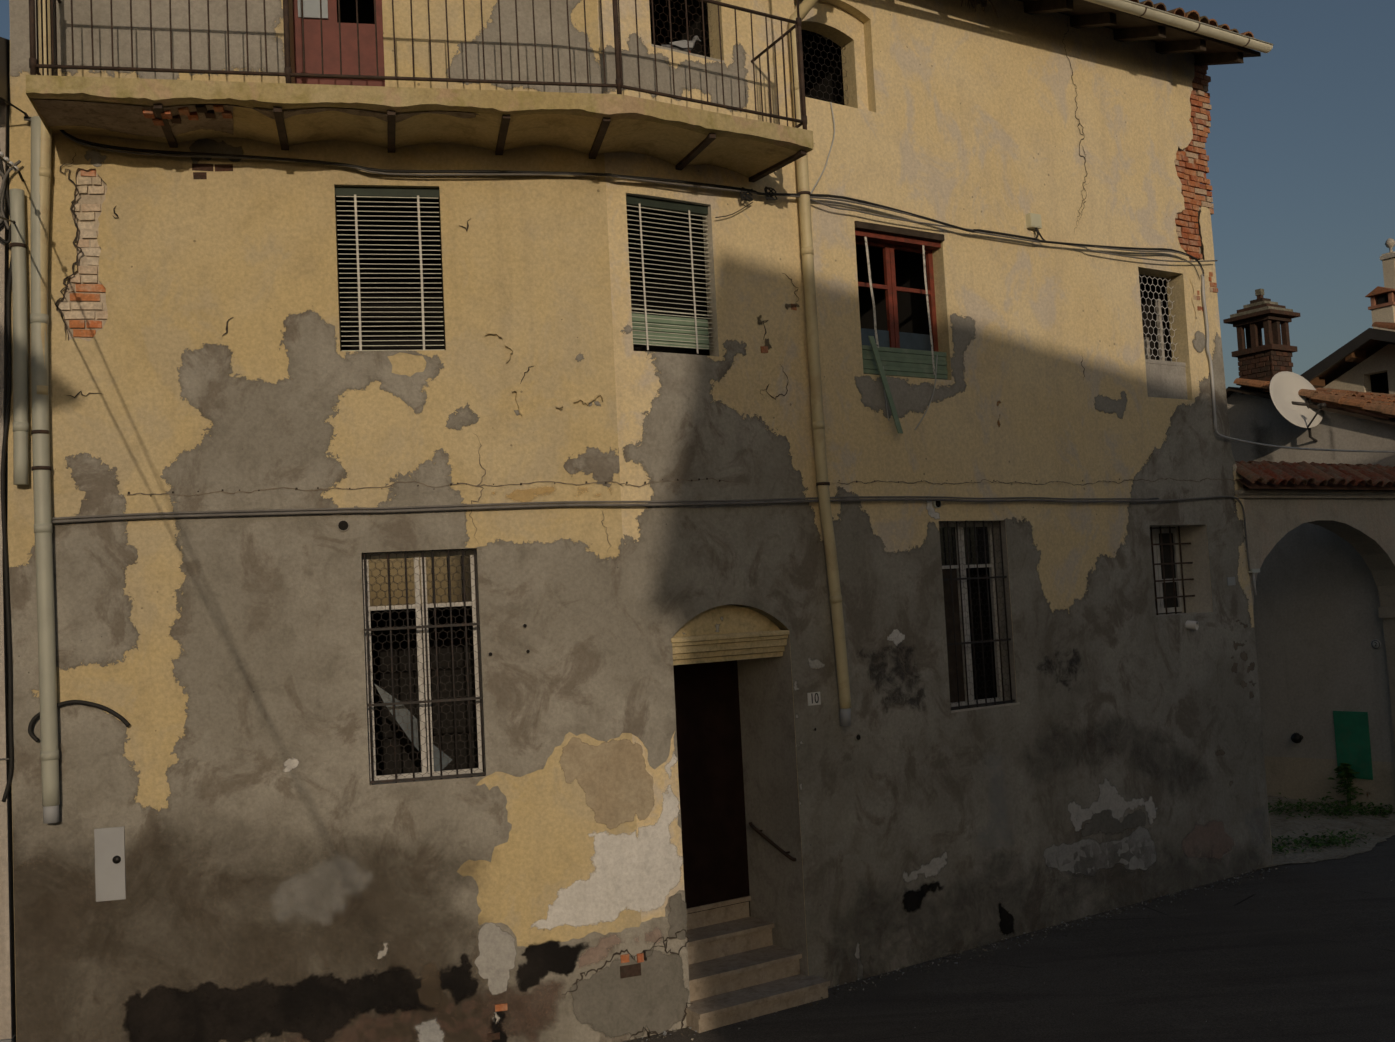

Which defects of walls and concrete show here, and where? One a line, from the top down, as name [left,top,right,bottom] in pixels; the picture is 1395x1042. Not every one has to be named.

peeling [10,0,37,77]
flaking render [59,149,108,337]
peeling [53,0,285,80]
spalling [32,99,478,179]
peeling [446,0,749,113]
crack [1062,17,1088,229]
flaking render [1174,65,1214,261]
peeling [8,272,1273,1042]
damp [13,832,662,1042]